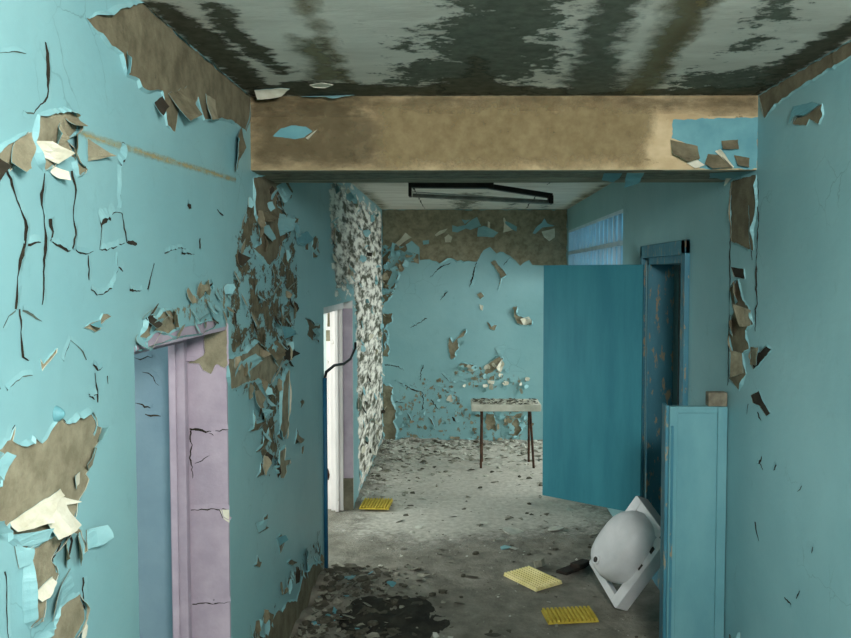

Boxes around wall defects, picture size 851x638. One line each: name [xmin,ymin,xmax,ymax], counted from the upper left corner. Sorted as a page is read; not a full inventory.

crack [0,42,52,119]
leakage [134,0,851,202]
crack [61,335,109,436]
crack [0,142,202,391]
crack [134,352,163,417]
crack [189,423,229,479]
peeling [135,174,330,480]
peeling [329,183,567,492]
peeling [727,266,772,391]
peeling [751,390,771,417]
peeling [0,407,114,638]
spalling [250,532,324,638]